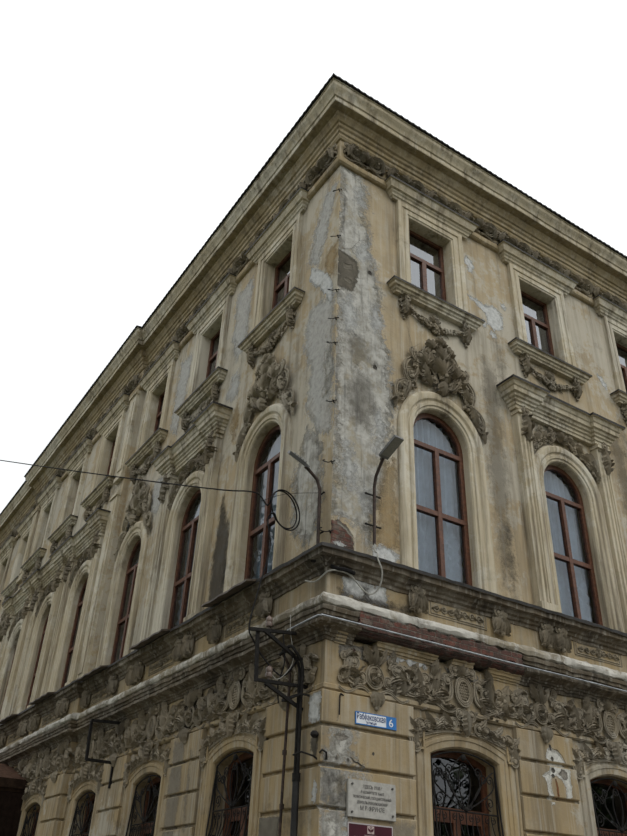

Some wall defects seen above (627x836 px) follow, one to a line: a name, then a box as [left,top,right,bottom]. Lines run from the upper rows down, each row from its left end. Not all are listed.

peeling [290,166,400,563]
peeling [467,293,506,339]
spalling [338,576,525,683]
peeling [308,691,368,836]
spalling [542,744,572,805]